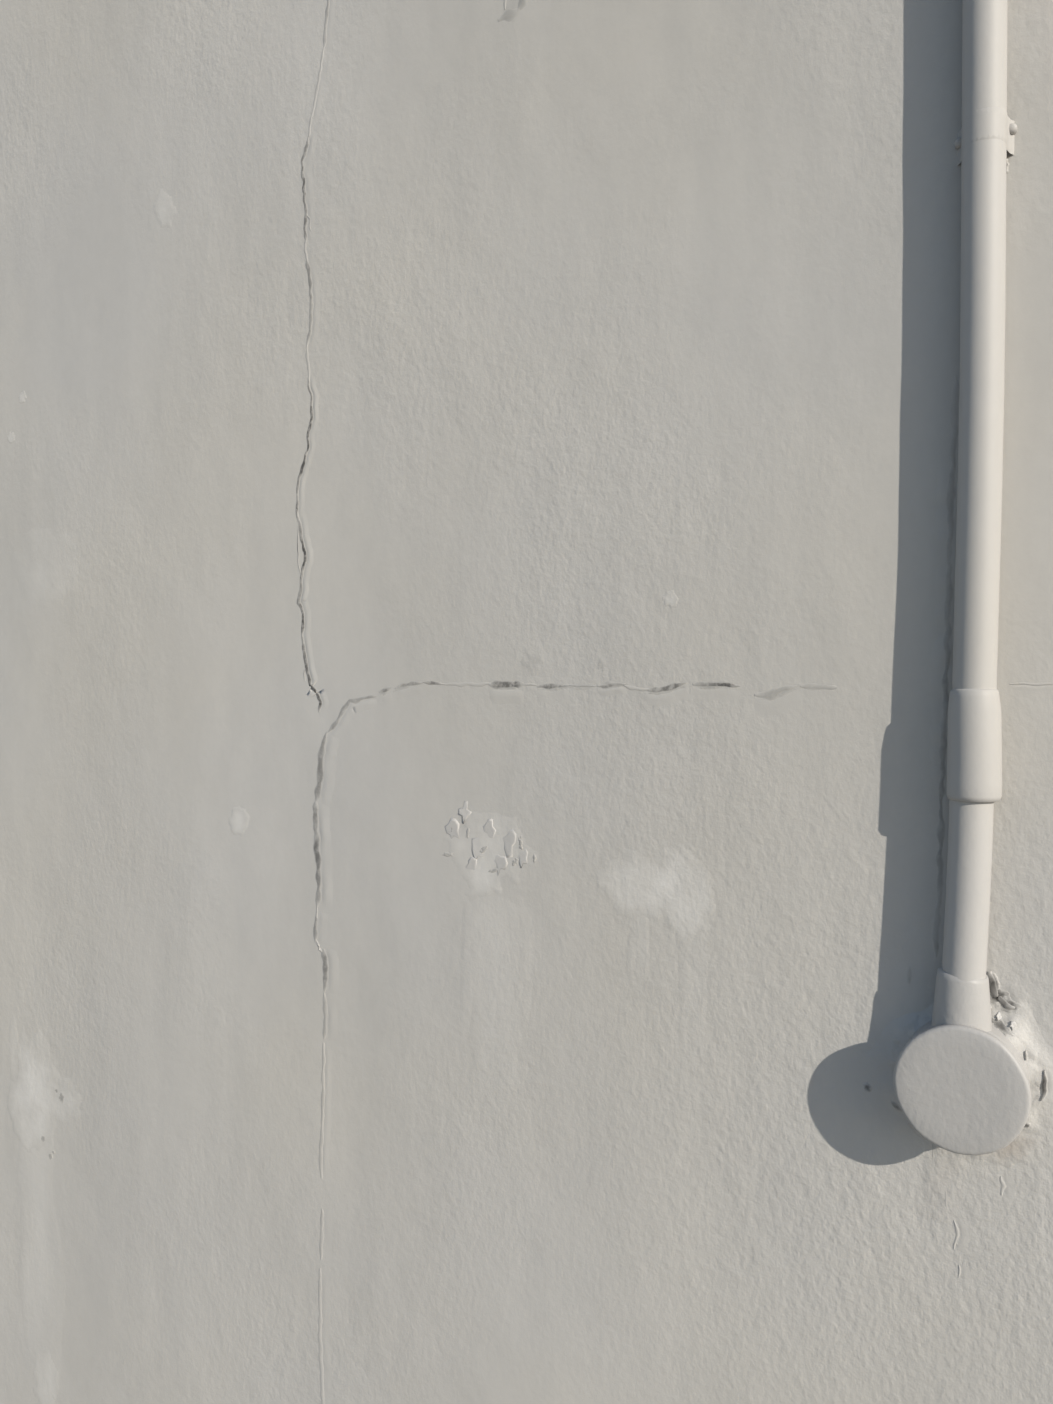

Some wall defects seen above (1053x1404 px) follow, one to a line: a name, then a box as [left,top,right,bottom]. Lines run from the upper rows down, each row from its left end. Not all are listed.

crack [296,0,837,1404]